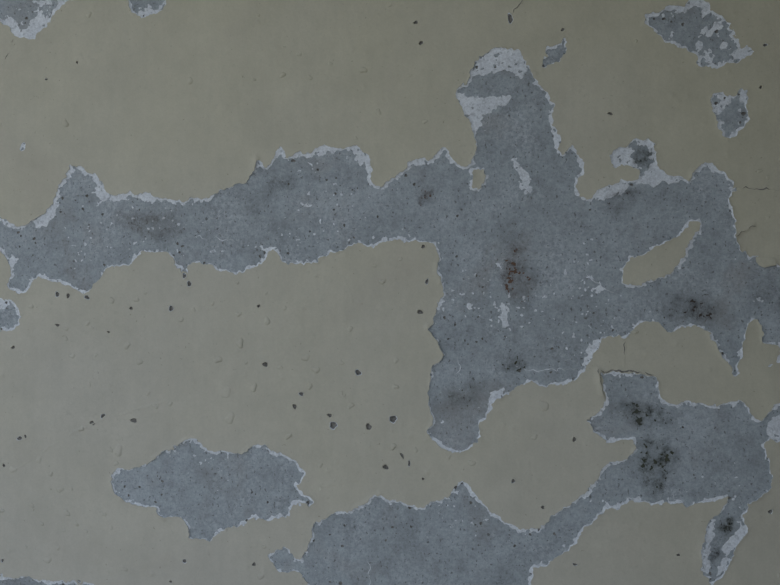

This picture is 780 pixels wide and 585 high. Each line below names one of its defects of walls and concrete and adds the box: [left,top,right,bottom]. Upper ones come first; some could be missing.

peeling [0,0,68,39]
peeling [128,0,166,18]
peeling [644,0,754,69]
peeling [0,47,780,453]
peeling [111,438,314,541]
peeling [268,371,780,585]
peeling [0,557,94,585]